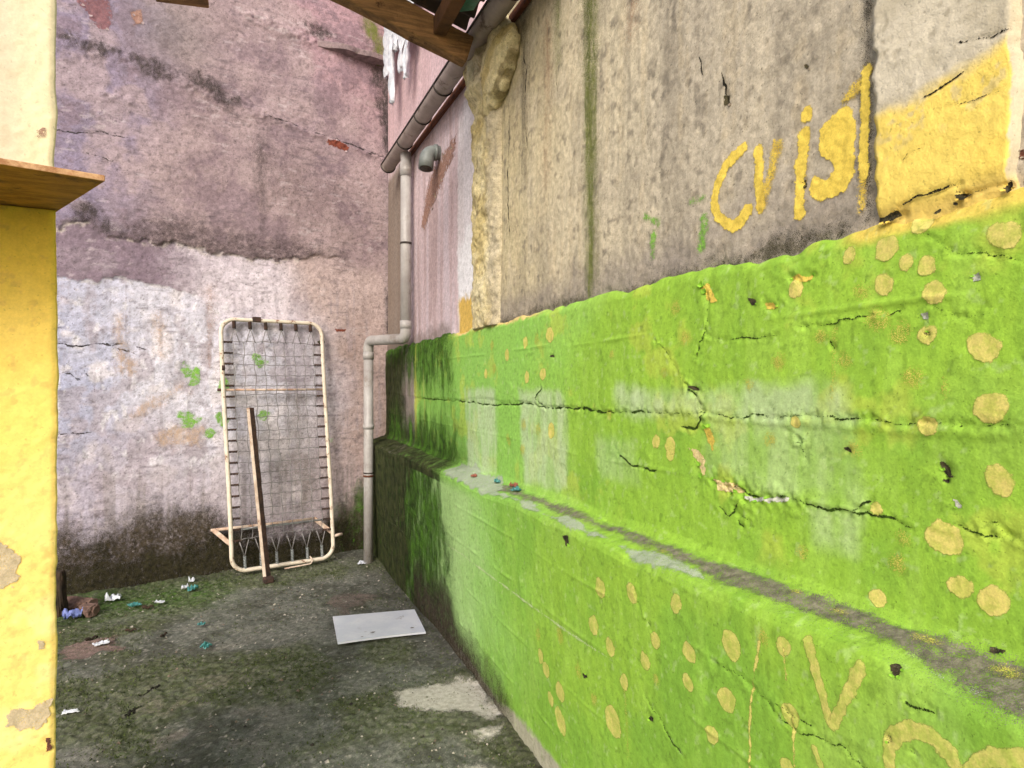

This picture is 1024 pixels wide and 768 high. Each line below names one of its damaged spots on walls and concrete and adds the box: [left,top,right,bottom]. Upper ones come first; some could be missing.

flaking render [77,0,113,30]
crack [57,129,122,162]
crack [270,116,383,157]
crack [902,184,987,205]
crack [423,380,963,430]
water stain [56,351,471,607]
crack [620,455,656,472]
crack [716,483,911,528]
crack [960,521,1009,538]
peeling [0,542,21,589]
peeling [5,698,53,752]